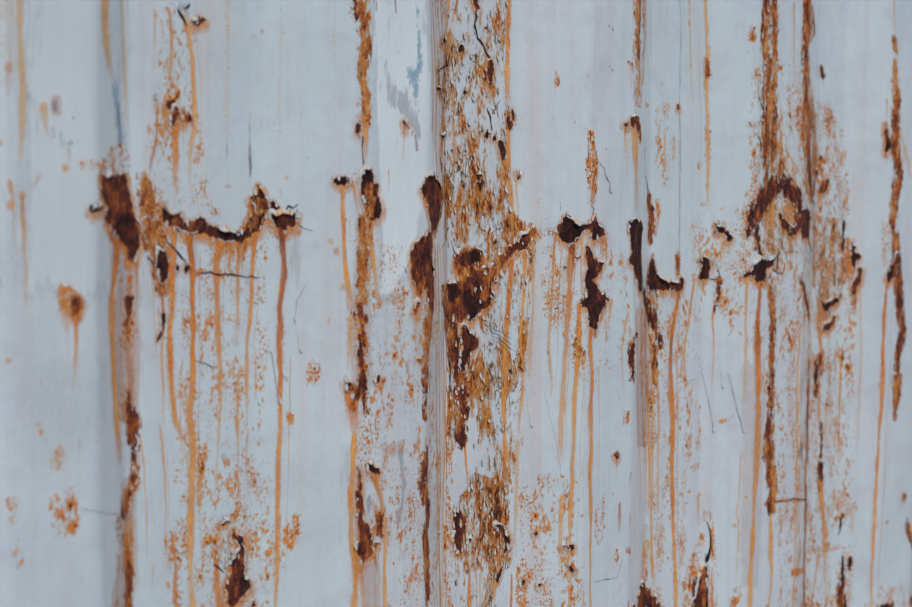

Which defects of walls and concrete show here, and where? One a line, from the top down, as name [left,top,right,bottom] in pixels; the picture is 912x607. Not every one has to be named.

rust [56,282,86,354]
rust [80,143,146,607]
rust [158,50,204,164]
rust [160,175,312,607]
rust [306,363,321,383]
peeling [437,0,536,607]
rust [332,0,912,607]